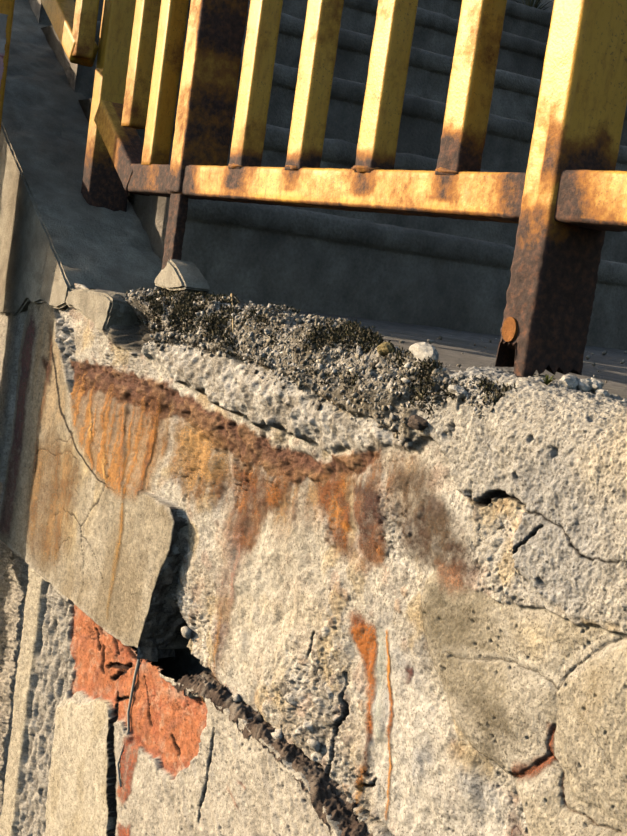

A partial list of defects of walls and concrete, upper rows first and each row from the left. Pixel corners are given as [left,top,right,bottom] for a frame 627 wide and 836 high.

crack [37,346,109,584]
corrosion [70,360,469,605]
spalling [55,283,627,836]
corrosion [351,615,393,818]
crack [449,653,582,690]
crack [469,490,627,563]